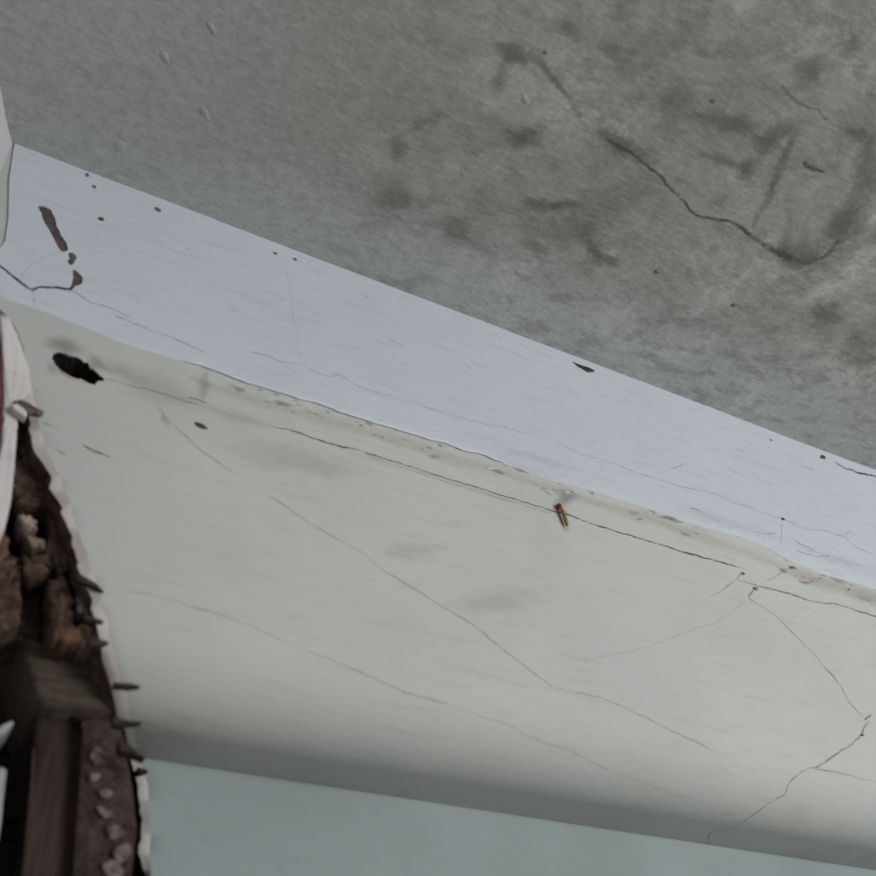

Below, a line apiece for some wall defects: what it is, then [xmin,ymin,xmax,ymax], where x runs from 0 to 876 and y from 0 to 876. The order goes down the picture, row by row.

peeling [9,400,44,423]
peeling [0,721,14,751]
peeling [88,747,131,876]